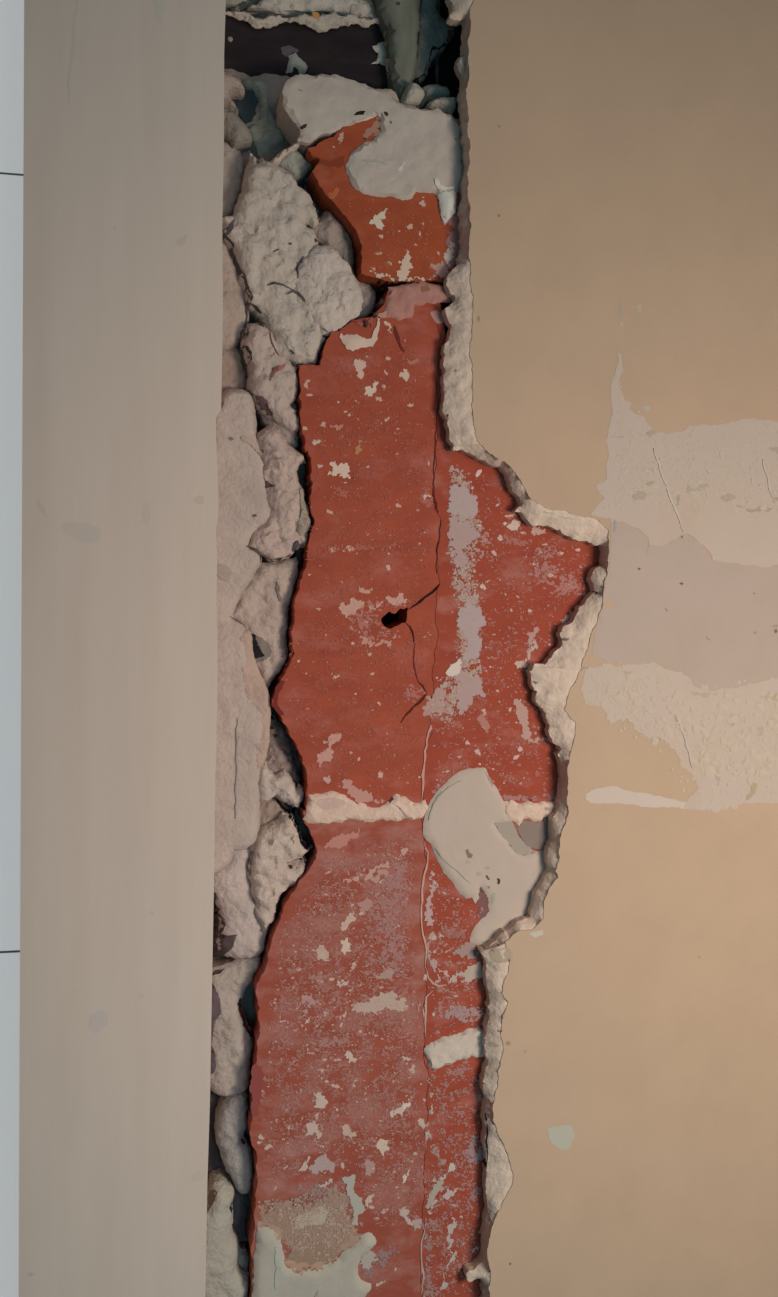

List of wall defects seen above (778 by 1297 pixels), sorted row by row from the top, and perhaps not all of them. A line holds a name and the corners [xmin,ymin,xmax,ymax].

spalling [286,53,308,74]
spalling [371,42,386,66]
crack [401,423,442,722]
spalling [439,0,609,1297]